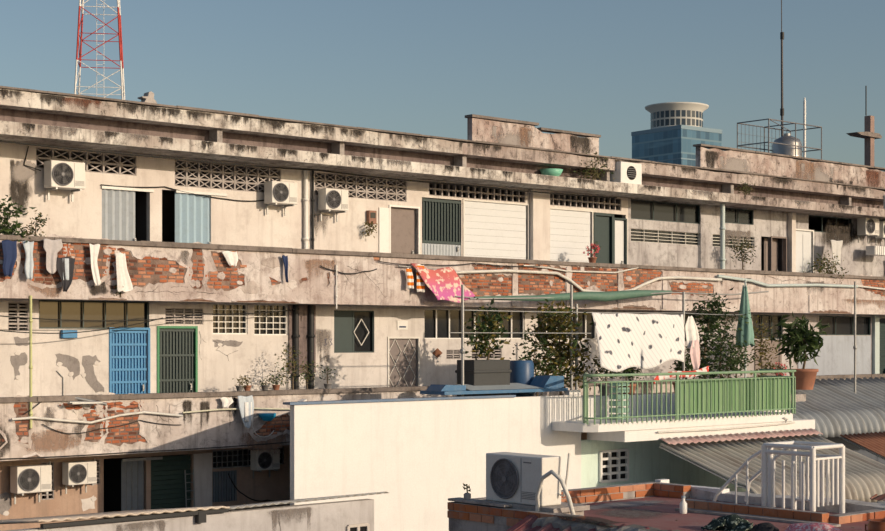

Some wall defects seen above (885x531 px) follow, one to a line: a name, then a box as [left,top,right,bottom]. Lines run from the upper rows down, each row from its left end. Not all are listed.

water stain [40,94,100,106]
water stain [117,103,211,119]
water stain [303,124,365,136]
water stain [570,135,591,154]
water stain [705,150,719,168]
water stain [10,160,30,210]
water stain [772,161,816,185]
water stain [830,170,879,193]
flaking render [0,234,299,303]
flaking render [55,353,151,449]
flaking render [0,395,45,460]
flaking render [248,410,290,442]